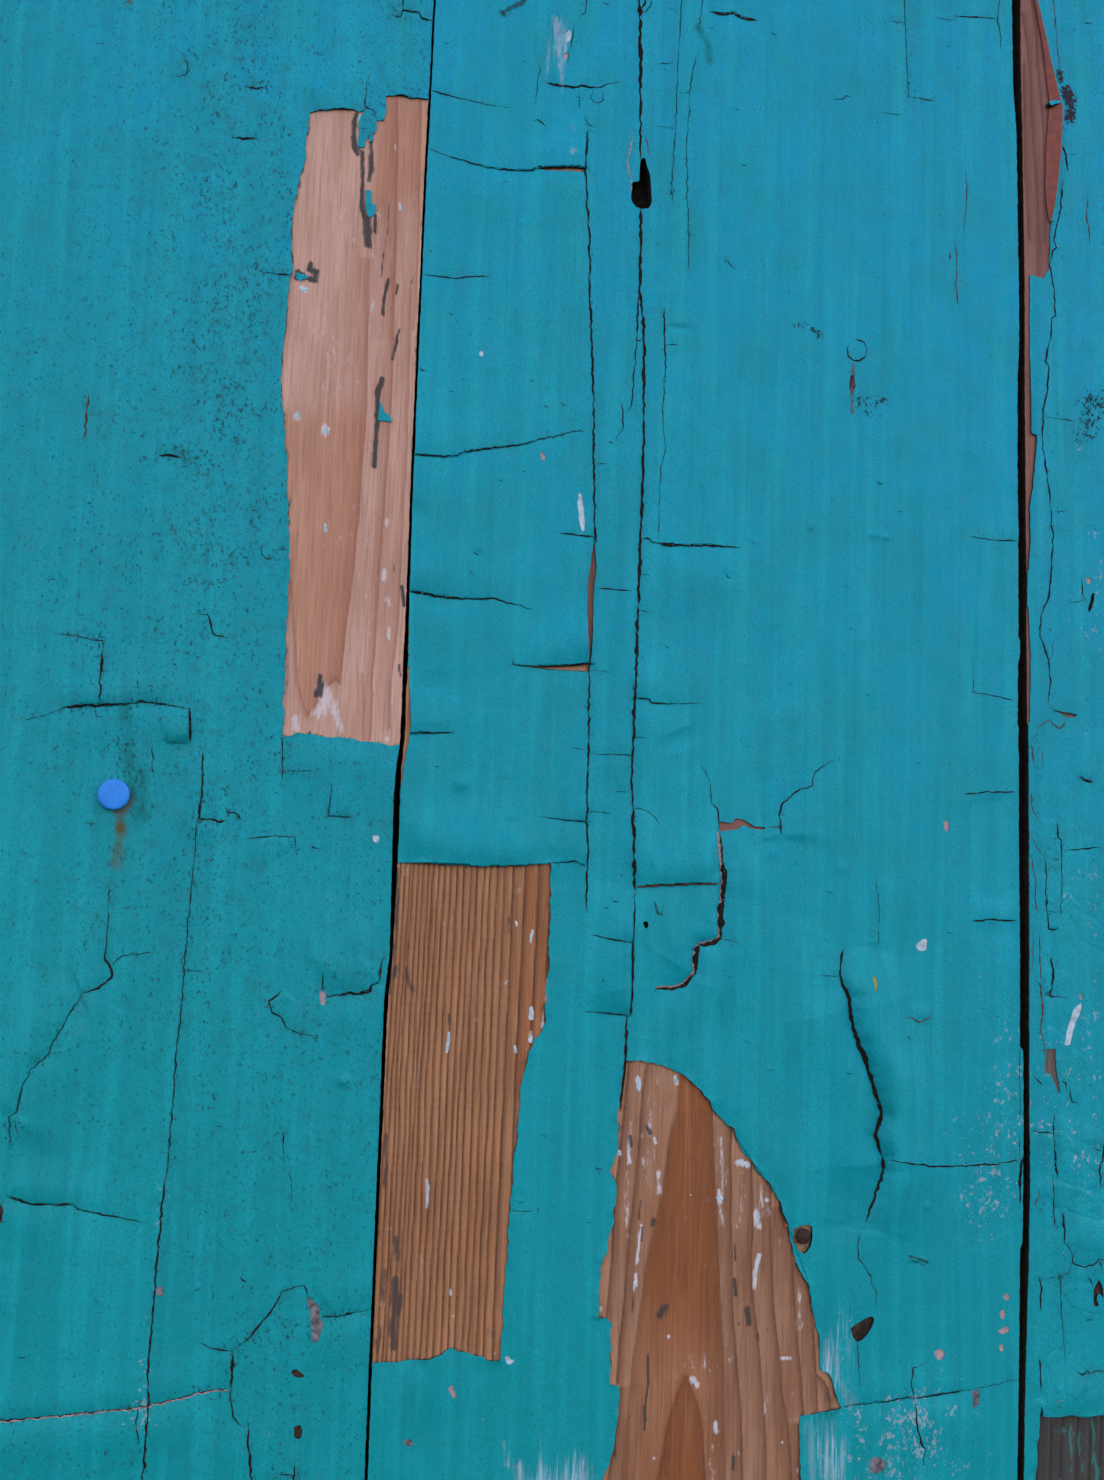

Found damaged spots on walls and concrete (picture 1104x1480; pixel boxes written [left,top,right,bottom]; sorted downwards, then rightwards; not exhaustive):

crack [0,633,366,1480]
crack [322,957,385,997]
peeling [280,96,596,1365]
crack [410,0,758,1111]
peeling [598,1060,840,1480]
crack [779,761,831,835]
crack [821,127,1104,1466]
peeling [1012,0,1064,727]